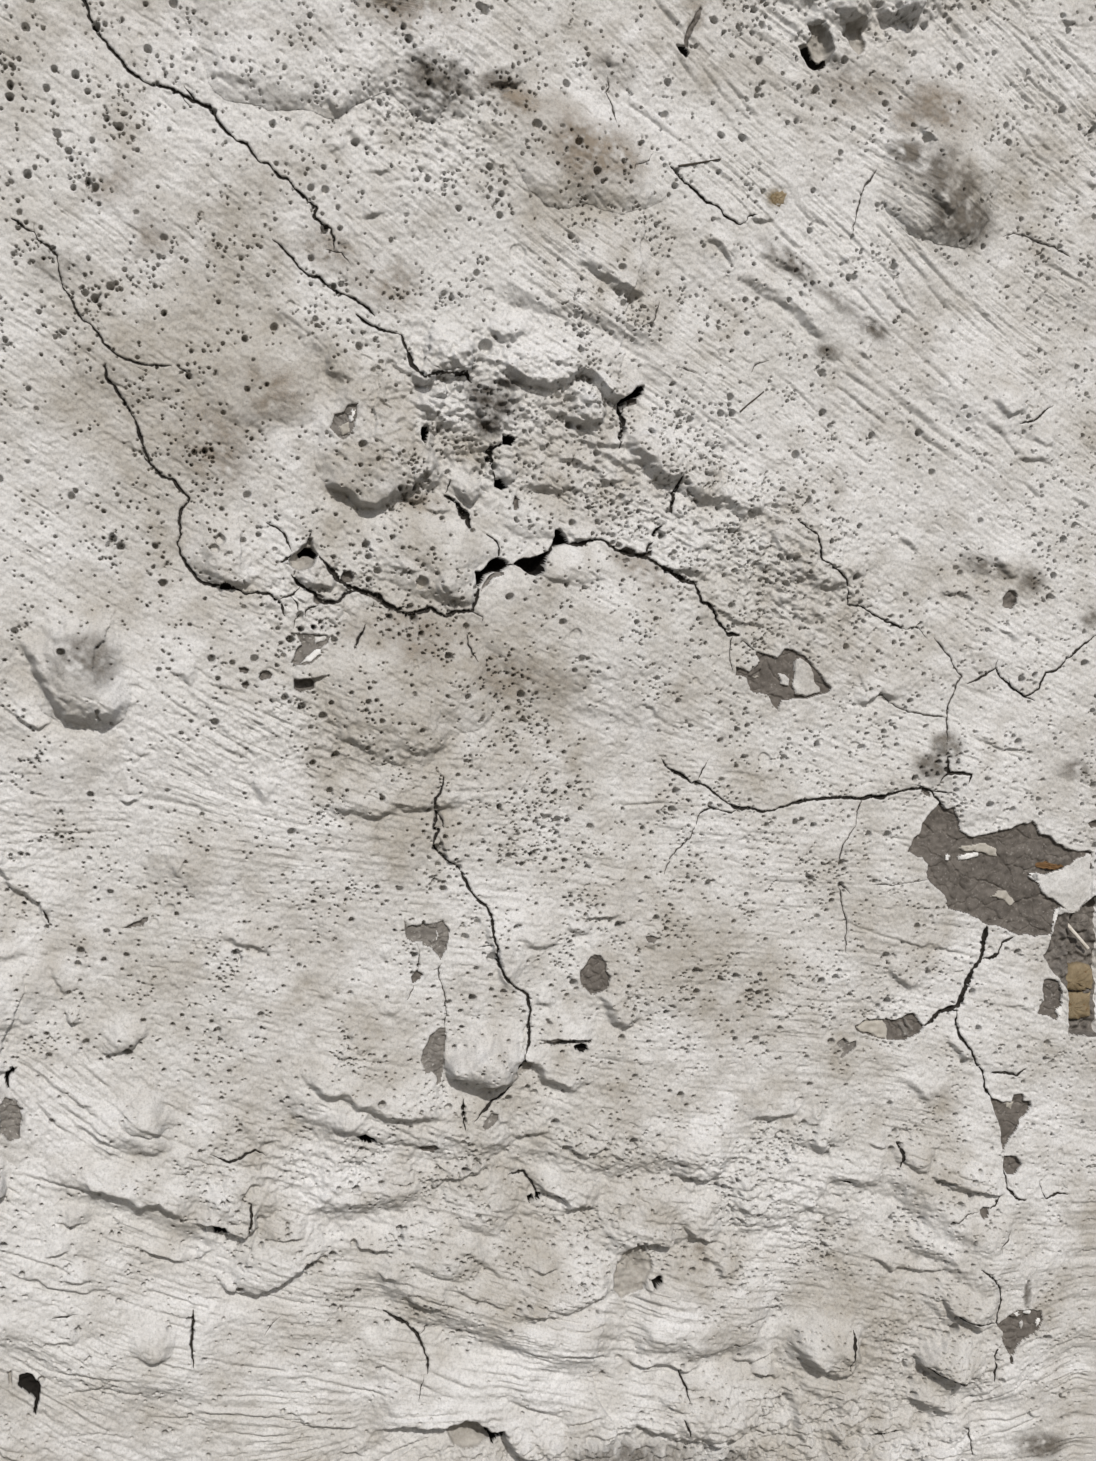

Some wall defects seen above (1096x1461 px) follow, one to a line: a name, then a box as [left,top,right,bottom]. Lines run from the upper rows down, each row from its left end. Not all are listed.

crack [82,0,472,383]
crack [635,154,756,225]
crack [11,218,755,670]
spalling [736,649,831,710]
crack [661,520,1096,952]
spalling [908,804,1093,937]
crack [433,776,532,1131]
spalling [580,955,611,995]
crack [921,926,1025,1098]
spalling [1038,979,1064,1020]
spalling [991,1094,1031,1175]
spalling [997,1309,1043,1364]